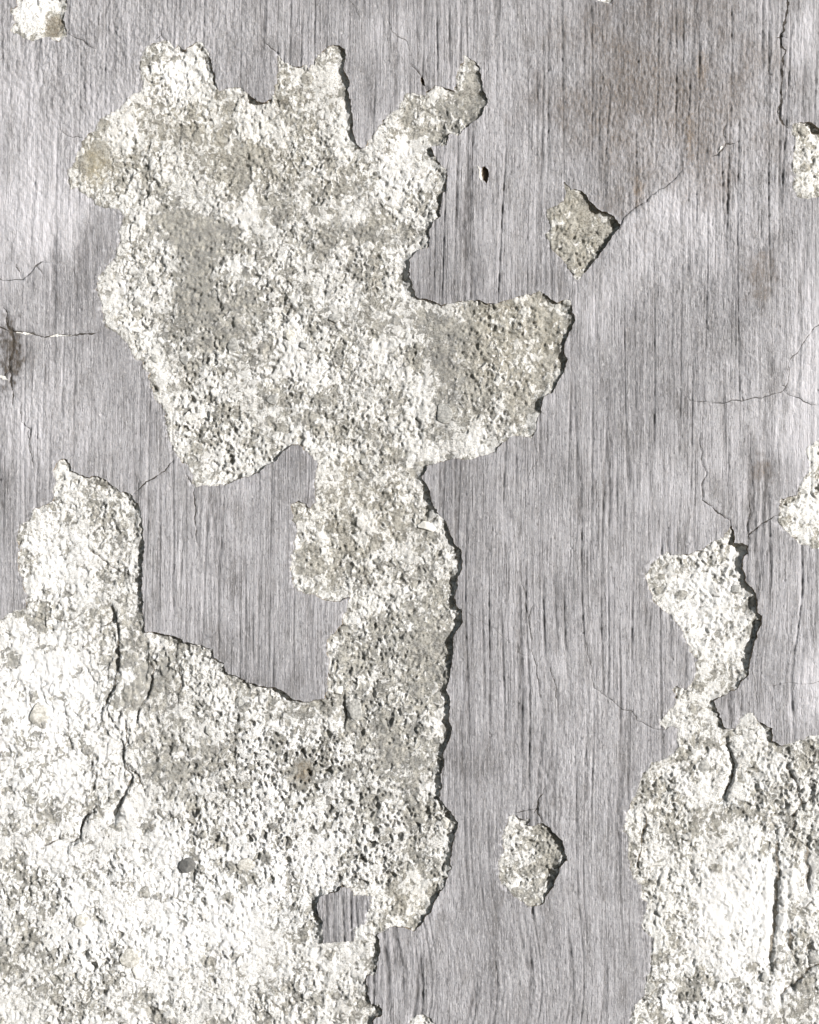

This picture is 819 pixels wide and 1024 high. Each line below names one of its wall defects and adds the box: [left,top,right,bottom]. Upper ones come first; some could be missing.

spalling [10,0,67,42]
crack [777,0,790,128]
spalling [791,122,819,199]
crack [0,261,50,281]
spalling [545,182,621,281]
crack [687,325,819,405]
spalling [0,40,575,1024]
crack [699,438,777,539]
spalling [778,440,819,549]
crack [45,652,182,846]
spalling [622,526,819,1024]